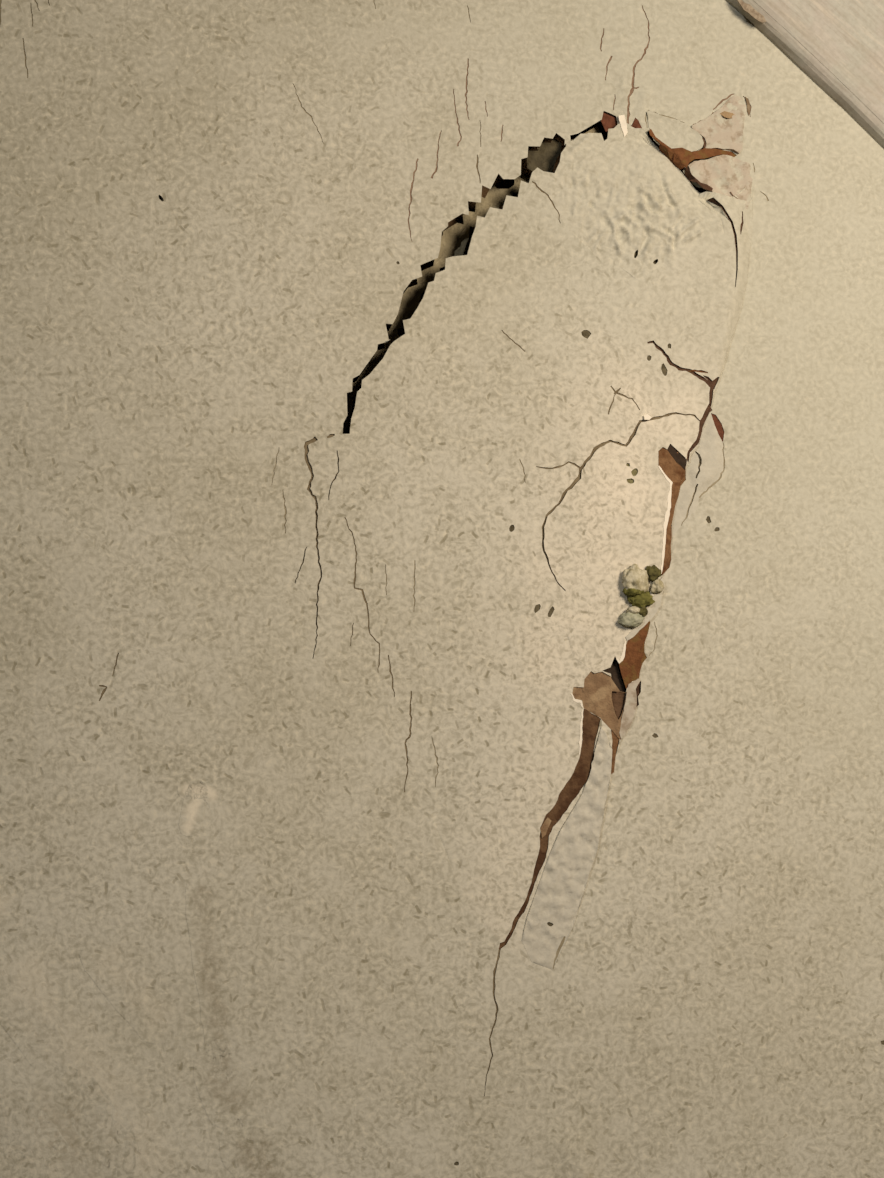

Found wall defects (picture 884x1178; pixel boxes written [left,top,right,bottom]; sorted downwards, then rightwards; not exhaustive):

crack [271,5,751,792]
flaking render [618,95,753,210]
crack [685,163,769,283]
flaking render [521,413,724,970]
crack [484,709,619,1096]